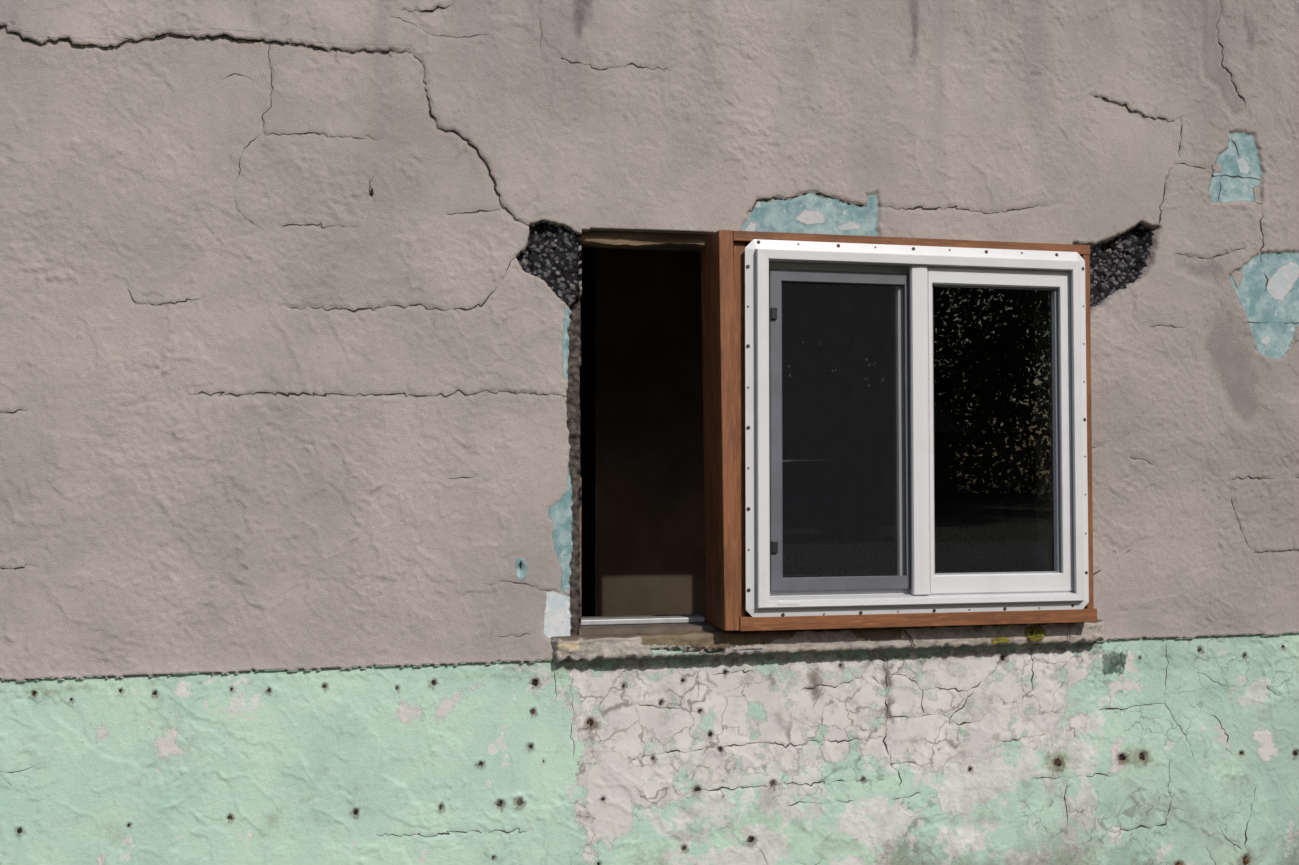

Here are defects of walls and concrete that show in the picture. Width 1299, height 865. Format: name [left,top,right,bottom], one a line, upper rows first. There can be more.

crack [0,5,532,312]
crack [1096,96,1204,226]
peeling [1209,133,1263,203]
peeling [741,193,878,236]
spalling [1090,223,1155,308]
crack [1177,214,1264,259]
peeling [1229,252,1299,359]
crack [189,389,552,397]
peeling [516,221,1105,864]
peeling [1105,648,1144,698]
crack [626,628,999,806]
peeling [1105,737,1126,779]